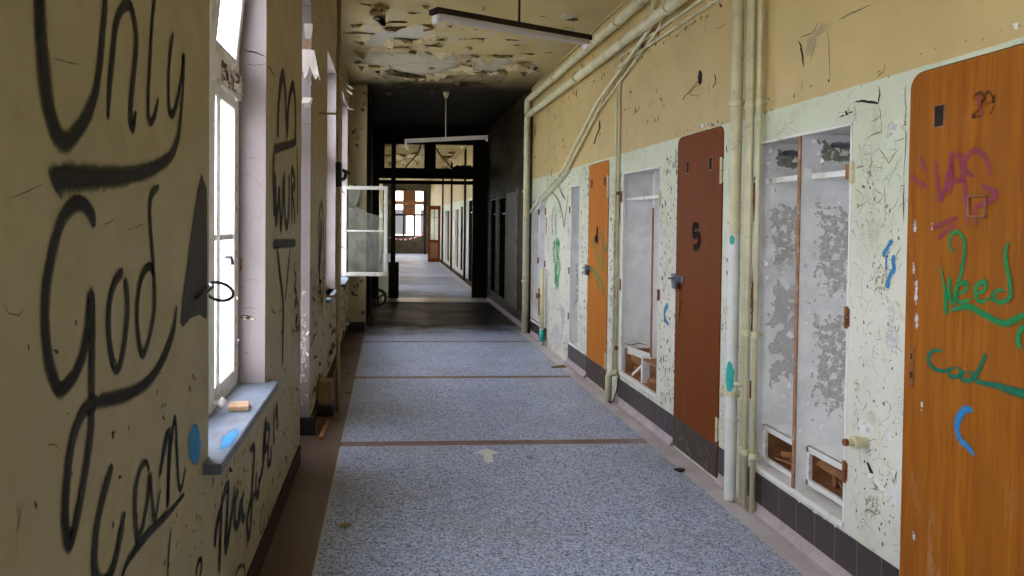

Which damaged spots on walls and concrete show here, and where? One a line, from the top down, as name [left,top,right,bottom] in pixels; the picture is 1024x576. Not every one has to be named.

peeling [349,5,540,96]
peeling [726,184,902,547]
crack [850,66,907,523]